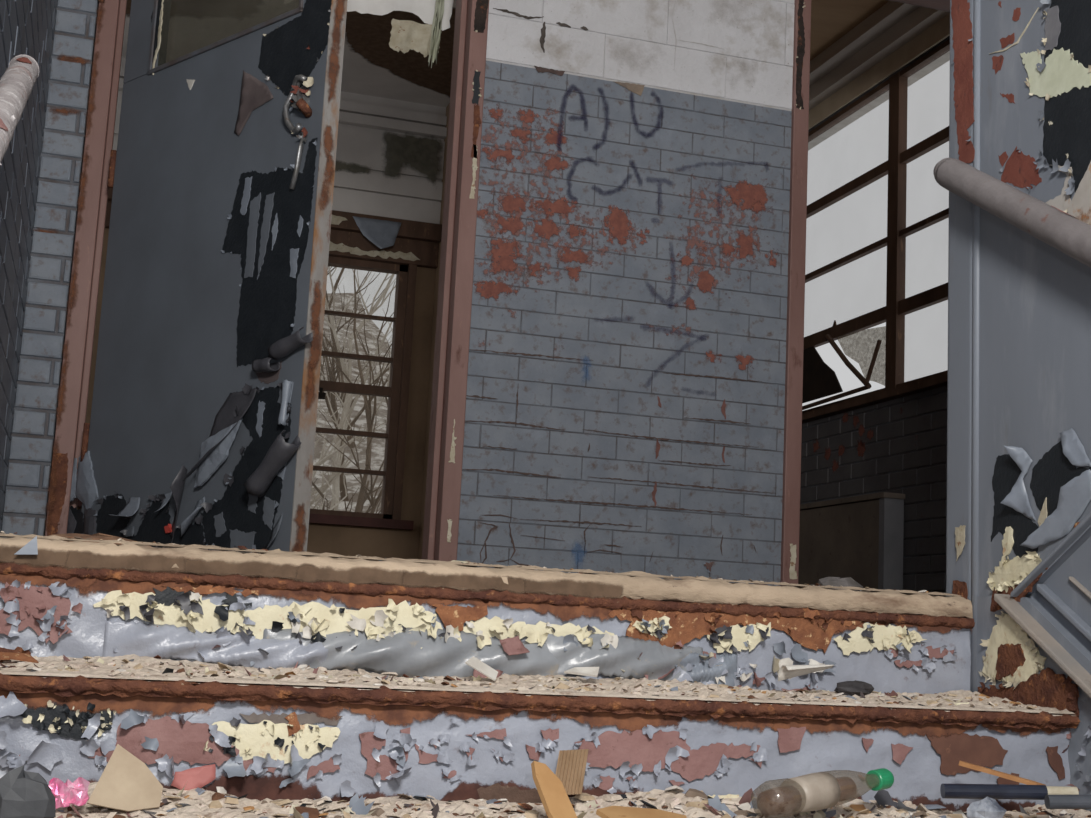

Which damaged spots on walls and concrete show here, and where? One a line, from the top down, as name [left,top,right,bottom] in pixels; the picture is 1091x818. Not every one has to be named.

peeling [951,0,975,163]
peeling [992,0,1091,225]
peeling [991,428,1091,558]
peeling [0,580,618,666]
corrosion [0,562,962,653]
peeling [632,616,957,691]
corrosion [978,526,1079,718]
peeling [0,691,355,797]
corrosion [203,774,399,803]
corrosion [440,780,531,803]
corrosion [0,689,1068,785]
corrosion [892,796,970,812]